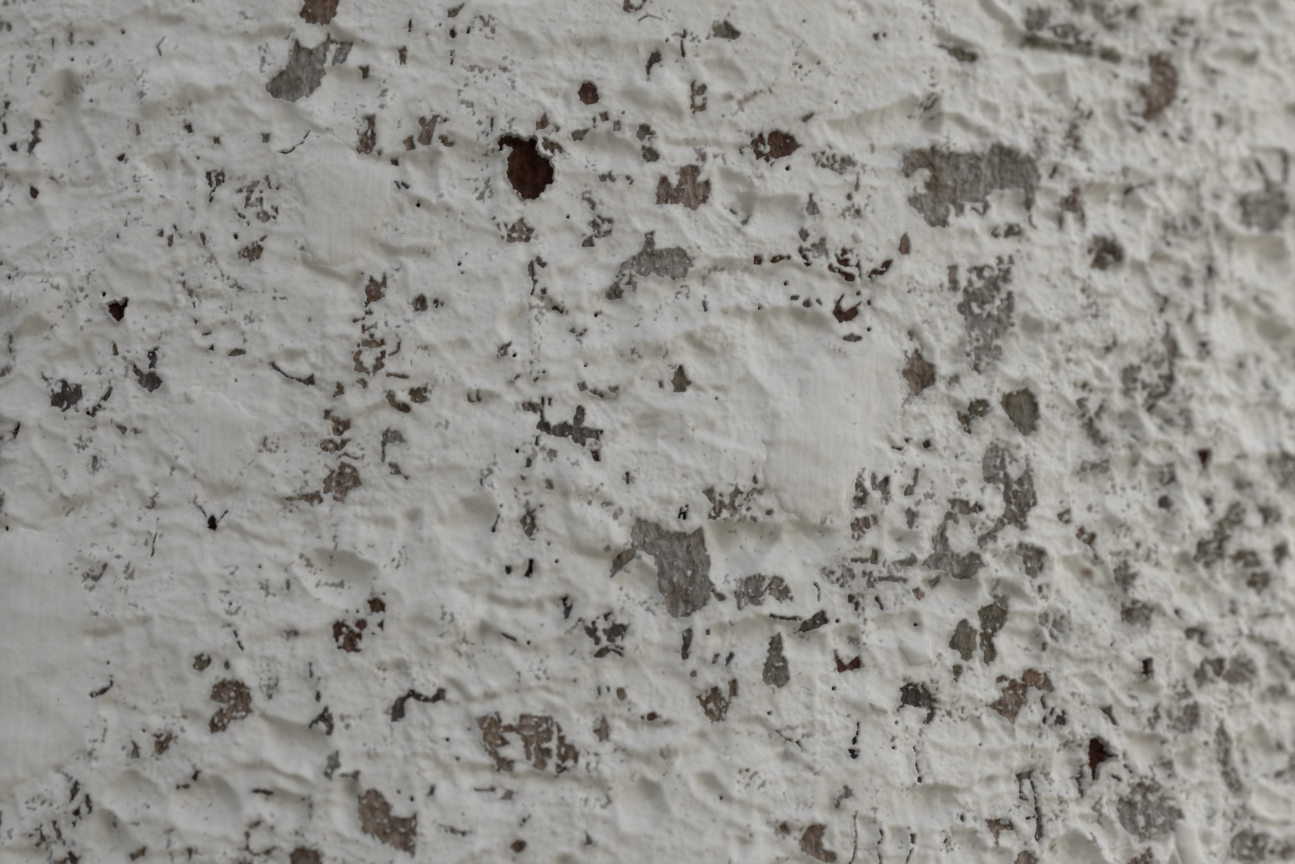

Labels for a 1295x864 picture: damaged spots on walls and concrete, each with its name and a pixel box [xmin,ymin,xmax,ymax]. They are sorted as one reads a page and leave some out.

peeling [266,0,369,103]
spalling [486,83,620,200]
peeling [655,154,710,211]
peeling [739,131,860,215]
peeling [901,143,1056,238]
peeling [902,331,958,397]
peeling [947,256,1013,374]
peeling [823,446,1046,611]
peeling [610,476,828,688]
peeling [391,688,445,722]
peeling [476,713,608,777]
peeling [324,752,417,857]